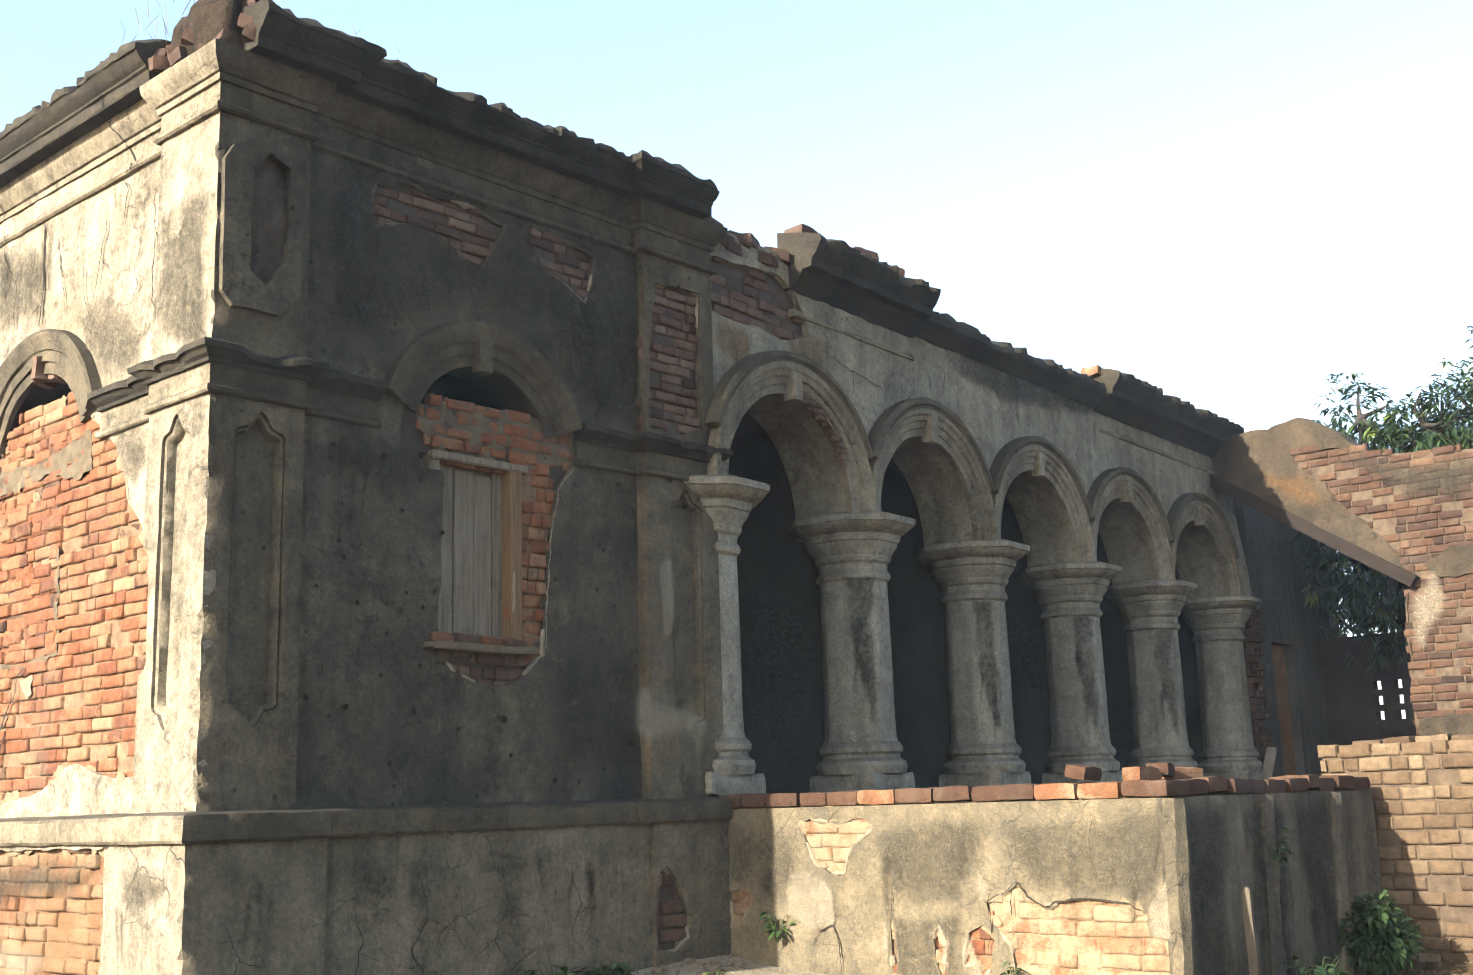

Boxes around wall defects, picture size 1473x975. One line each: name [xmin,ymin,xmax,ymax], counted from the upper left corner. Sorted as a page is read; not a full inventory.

spalling [371,182,500,266]
spalling [524,225,593,303]
spalling [635,256,804,435]
spalling [0,374,149,806]
spalling [438,458,558,687]
spalling [798,806,873,875]
spalling [0,849,104,975]
spalling [657,867,690,952]
spalling [729,888,755,928]
spalling [931,883,1170,975]